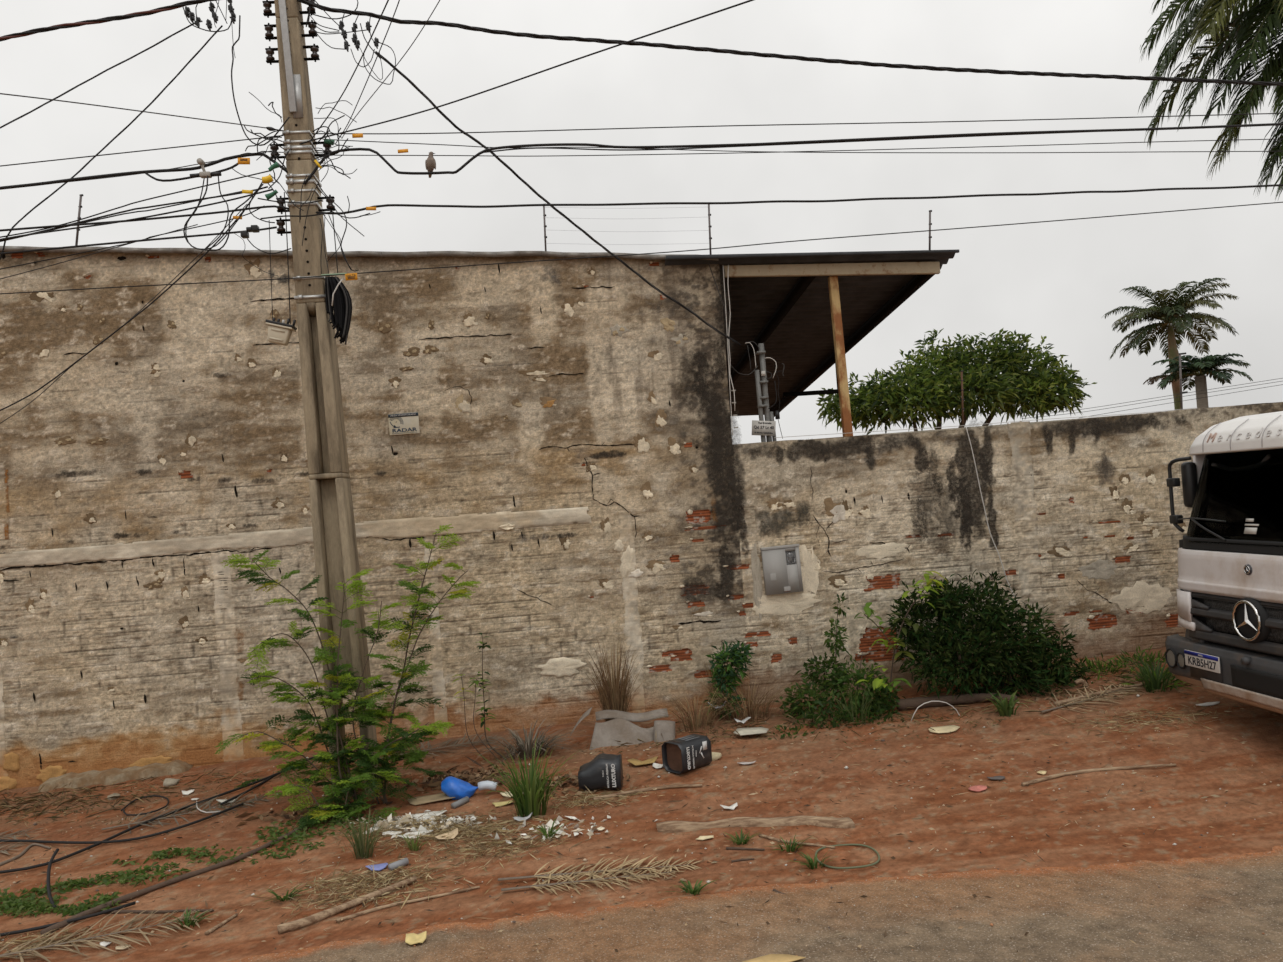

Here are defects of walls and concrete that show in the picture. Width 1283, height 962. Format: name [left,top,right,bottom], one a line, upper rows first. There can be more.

water stain [678,267,999,601]
crack [539,443,637,538]
peeling [814,561,848,588]
flaking render [864,573,900,592]
peeling [679,584,712,616]
flaking render [726,595,753,616]
flaking render [647,648,727,678]
flaking render [742,631,798,664]
flaking render [855,626,910,663]